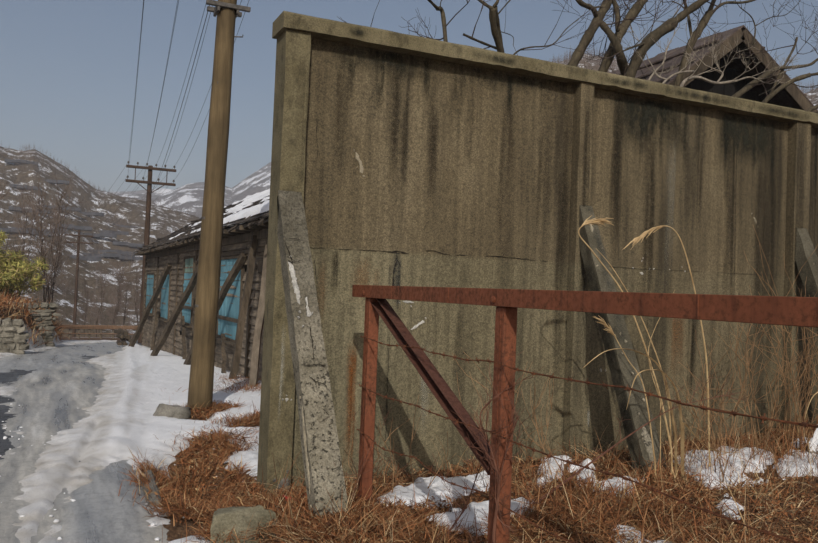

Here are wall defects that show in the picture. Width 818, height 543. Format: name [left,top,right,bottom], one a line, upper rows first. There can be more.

crack [286,238,463,286]
leakage [593,313,617,367]
leakage [609,377,634,435]